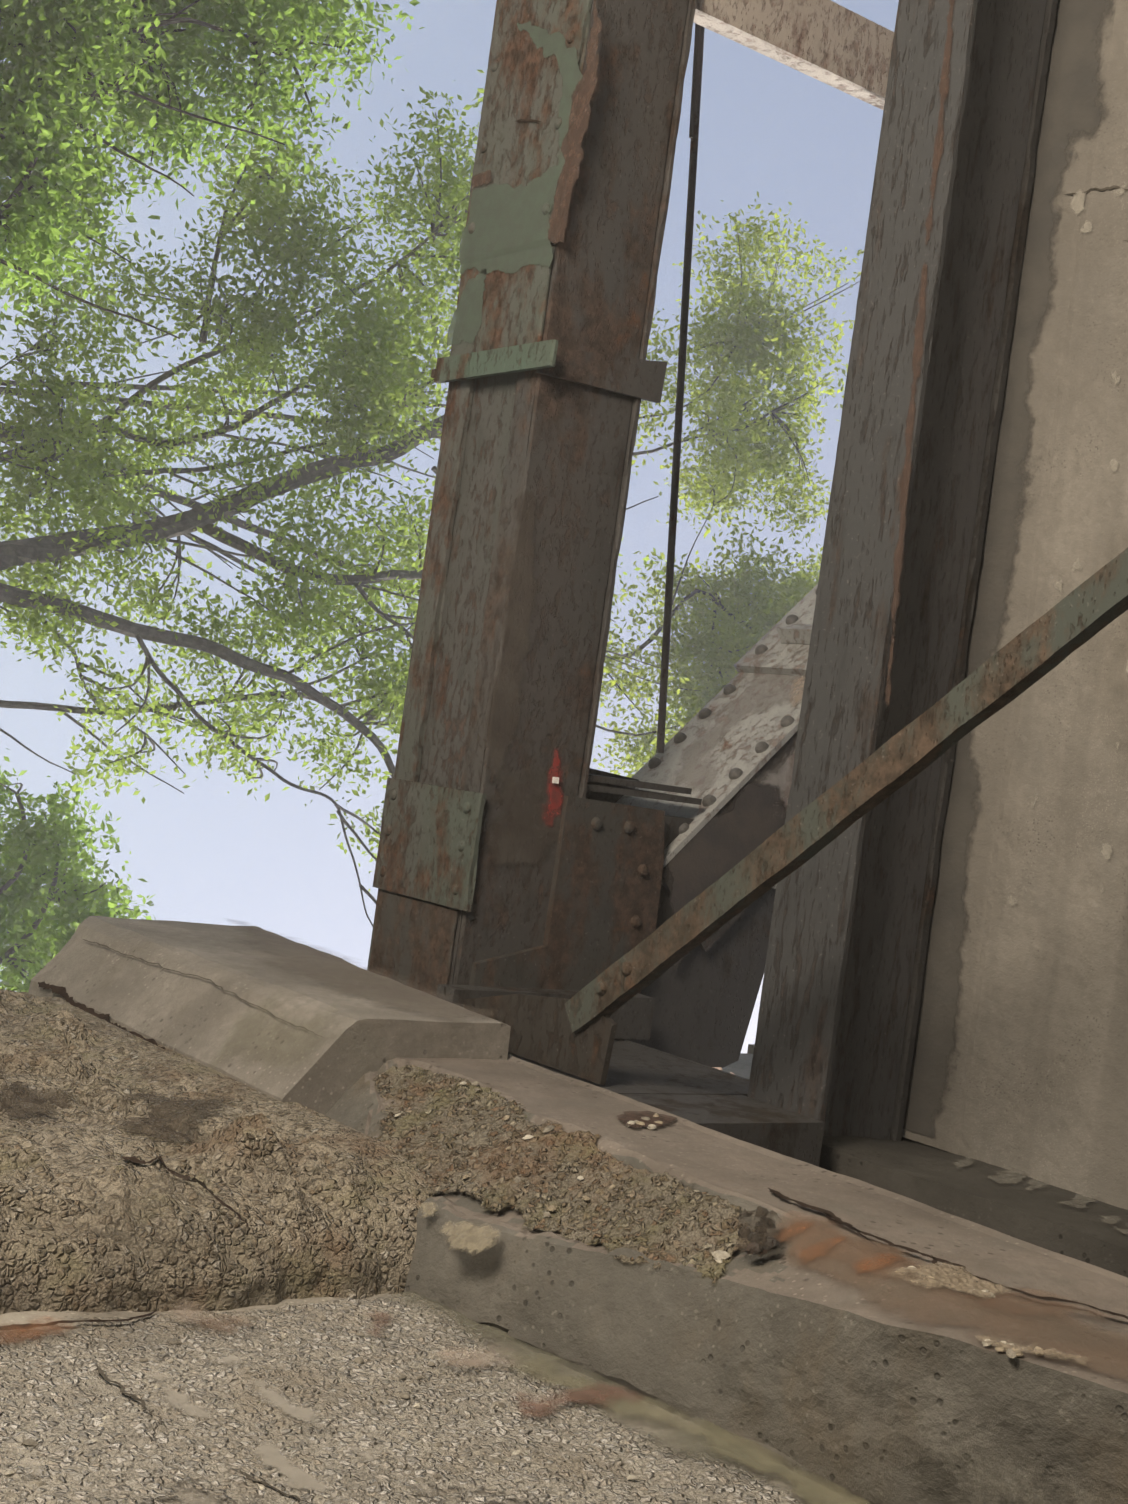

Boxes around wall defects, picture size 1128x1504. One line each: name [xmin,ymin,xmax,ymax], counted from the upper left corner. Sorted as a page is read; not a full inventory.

peeling [447,21,583,346]
rust [548,0,602,243]
crack [1064,185,1128,195]
rust [667,782,787,915]
crack [38,981,174,1054]
crack [83,939,324,1038]
crack [121,1156,248,1228]
spalling [373,1065,743,1284]
crack [768,1188,1128,1319]
spalling [0,1293,807,1504]